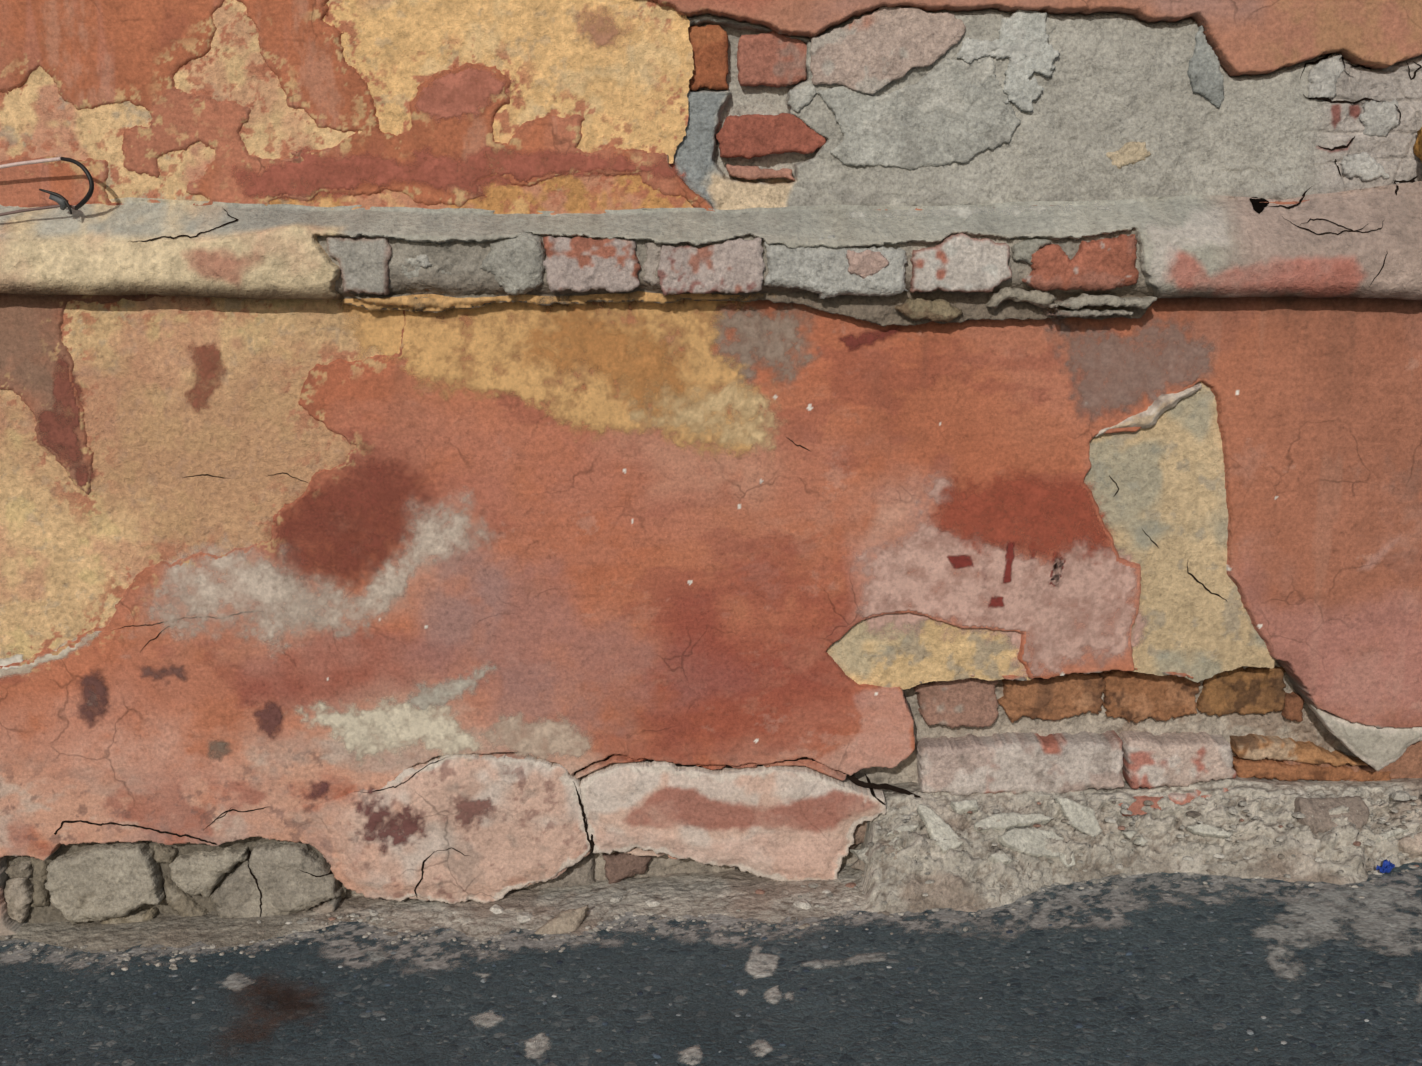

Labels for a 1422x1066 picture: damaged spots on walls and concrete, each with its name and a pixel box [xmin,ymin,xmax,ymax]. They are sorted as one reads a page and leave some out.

crack [128,209,238,242]
crack [1268,53,1422,287]
spalling [0,0,1422,660]
water stain [150,502,484,646]
flaking render [827,381,1422,846]
crack [54,807,266,917]
flaking render [4,837,346,925]
spalling [998,828,1075,868]